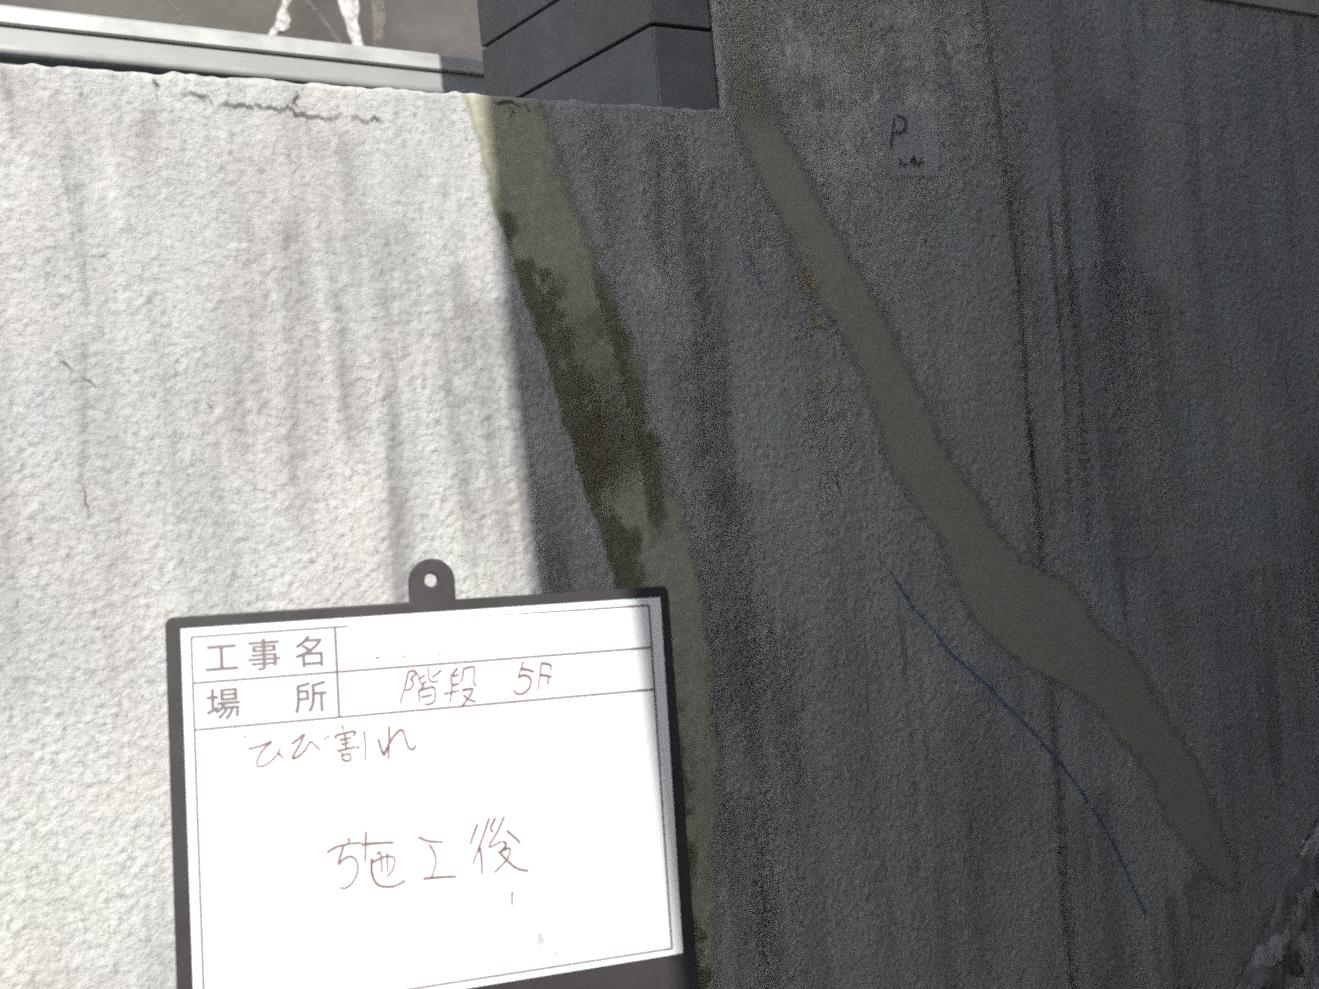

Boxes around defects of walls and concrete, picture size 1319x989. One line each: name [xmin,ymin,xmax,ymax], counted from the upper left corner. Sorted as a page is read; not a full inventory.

leakage [498,209,516,238]
leakage [516,260,641,589]
leakage [597,284,664,526]